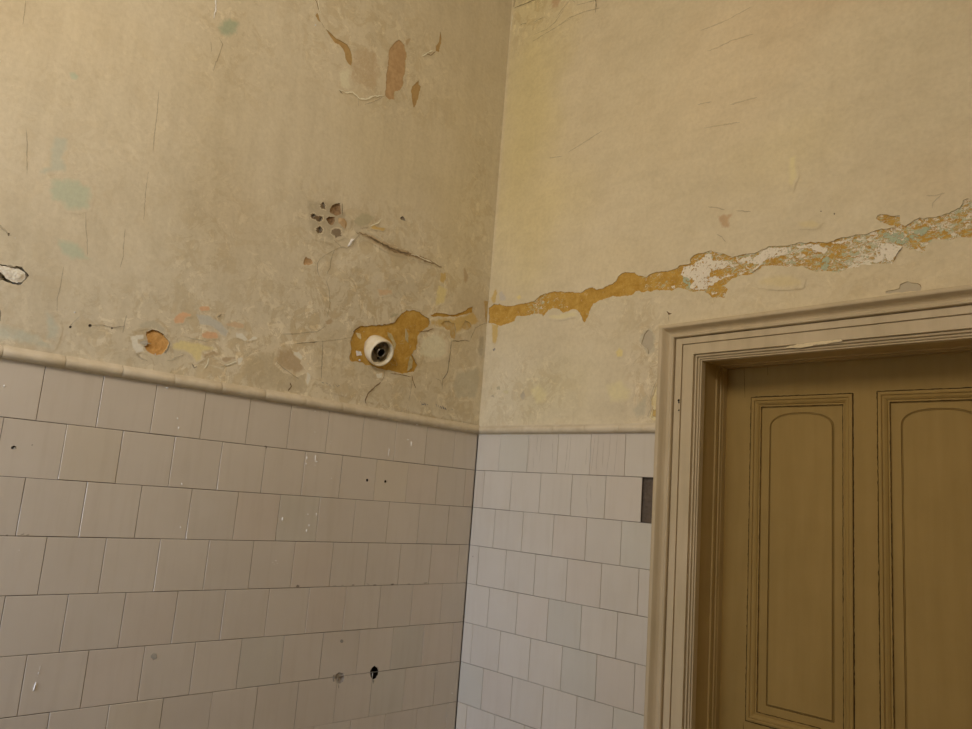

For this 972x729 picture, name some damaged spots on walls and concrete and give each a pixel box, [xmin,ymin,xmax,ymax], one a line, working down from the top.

peeling [385,37,421,107]
spalling [301,196,355,247]
crack [357,230,441,267]
spalling [0,264,29,285]
peeling [349,198,972,374]
spalling [129,329,170,355]
peeling [641,477,653,523]